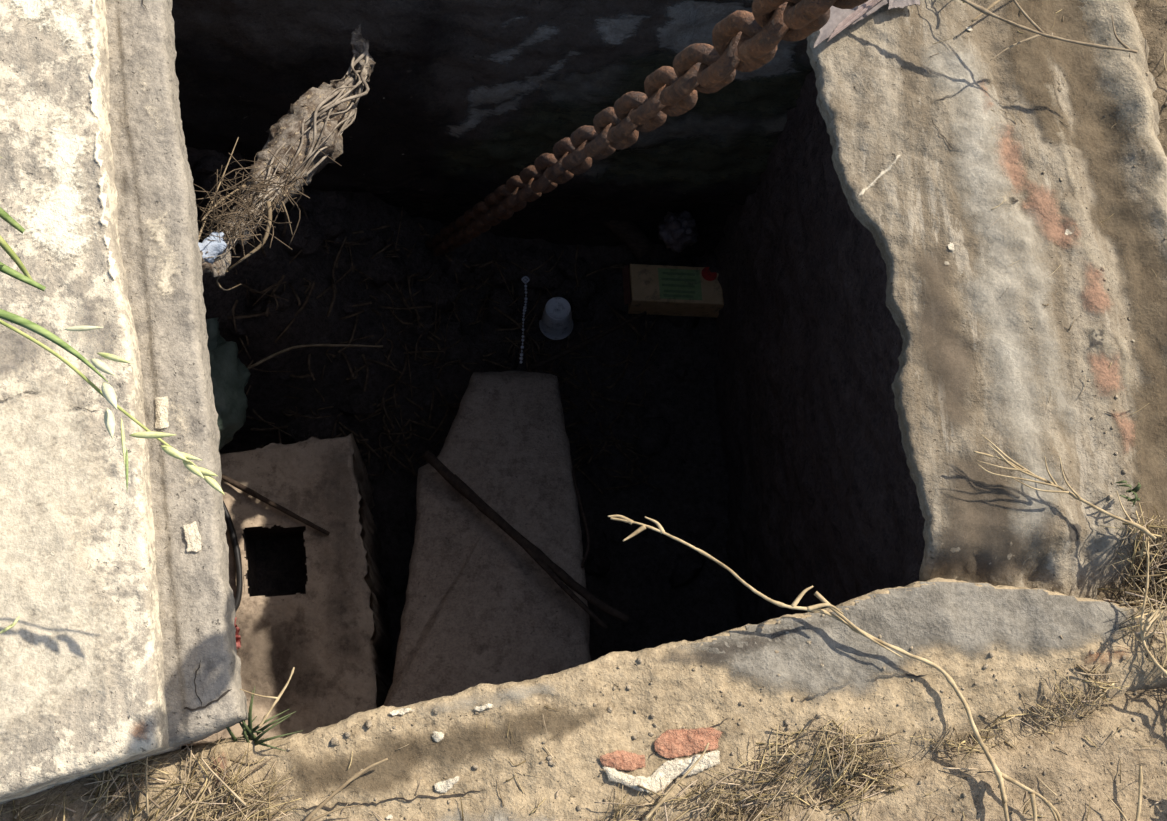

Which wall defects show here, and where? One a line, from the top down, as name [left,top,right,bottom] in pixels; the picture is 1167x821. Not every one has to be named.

leakage [175,43,352,167]
leakage [303,53,676,226]
leakage [489,63,811,259]
crack [0,391,39,402]
crack [798,673,927,702]
spalling [600,727,722,793]
crack [294,790,483,811]